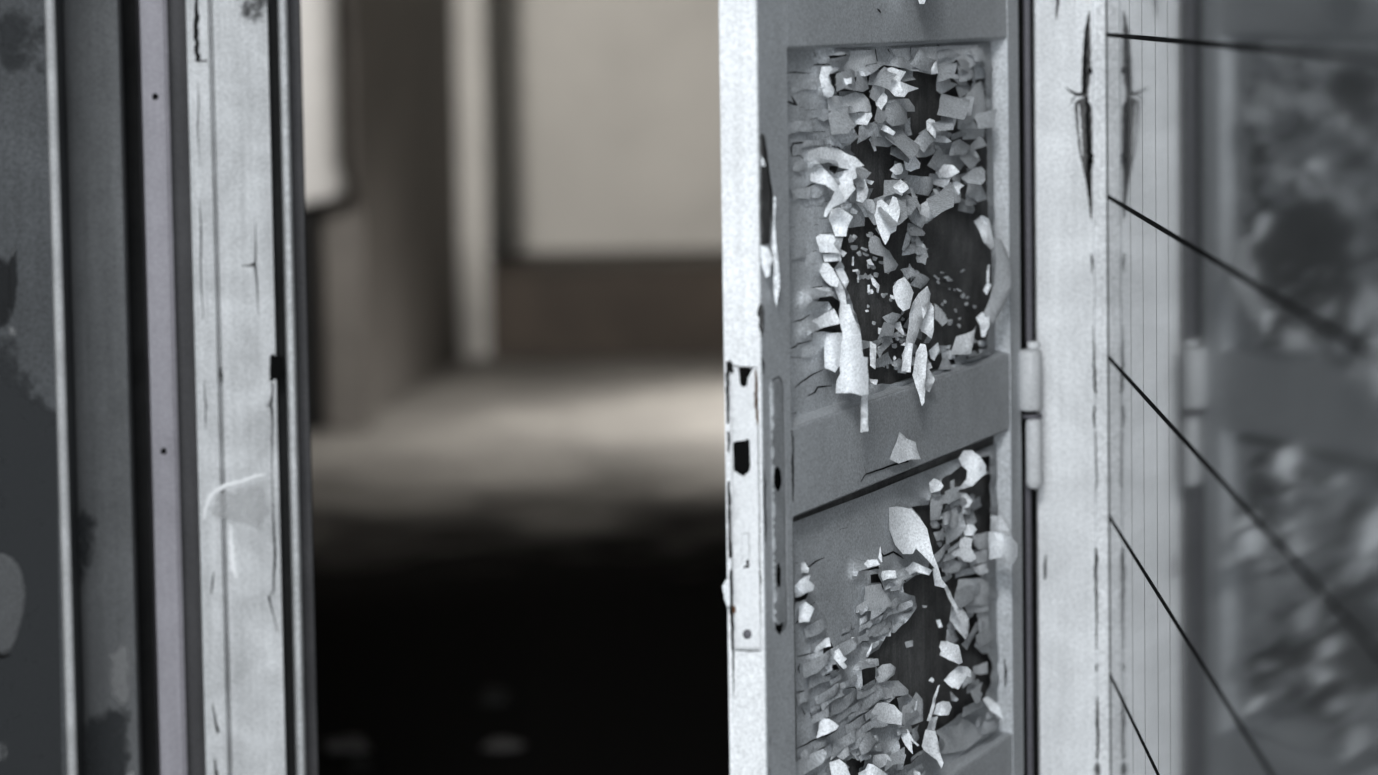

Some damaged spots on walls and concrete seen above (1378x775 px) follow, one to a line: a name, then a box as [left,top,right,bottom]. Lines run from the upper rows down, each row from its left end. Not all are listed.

peeling [0,243,17,334]
peeling [757,41,1013,432]
peeling [793,432,1018,775]